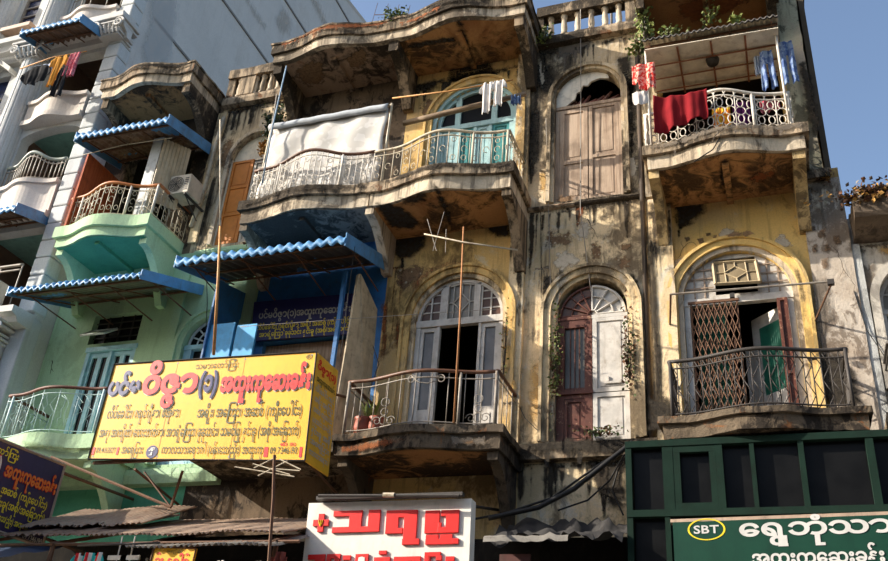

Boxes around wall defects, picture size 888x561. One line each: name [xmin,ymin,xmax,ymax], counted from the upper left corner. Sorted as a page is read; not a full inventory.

leakage [408,20,469,49]
leakage [416,63,518,101]
leakage [375,186,456,299]
leakage [488,225,510,237]
flaking render [545,231,579,272]
leakage [516,195,631,326]
flaking render [591,243,601,259]
leakage [517,436,625,517]